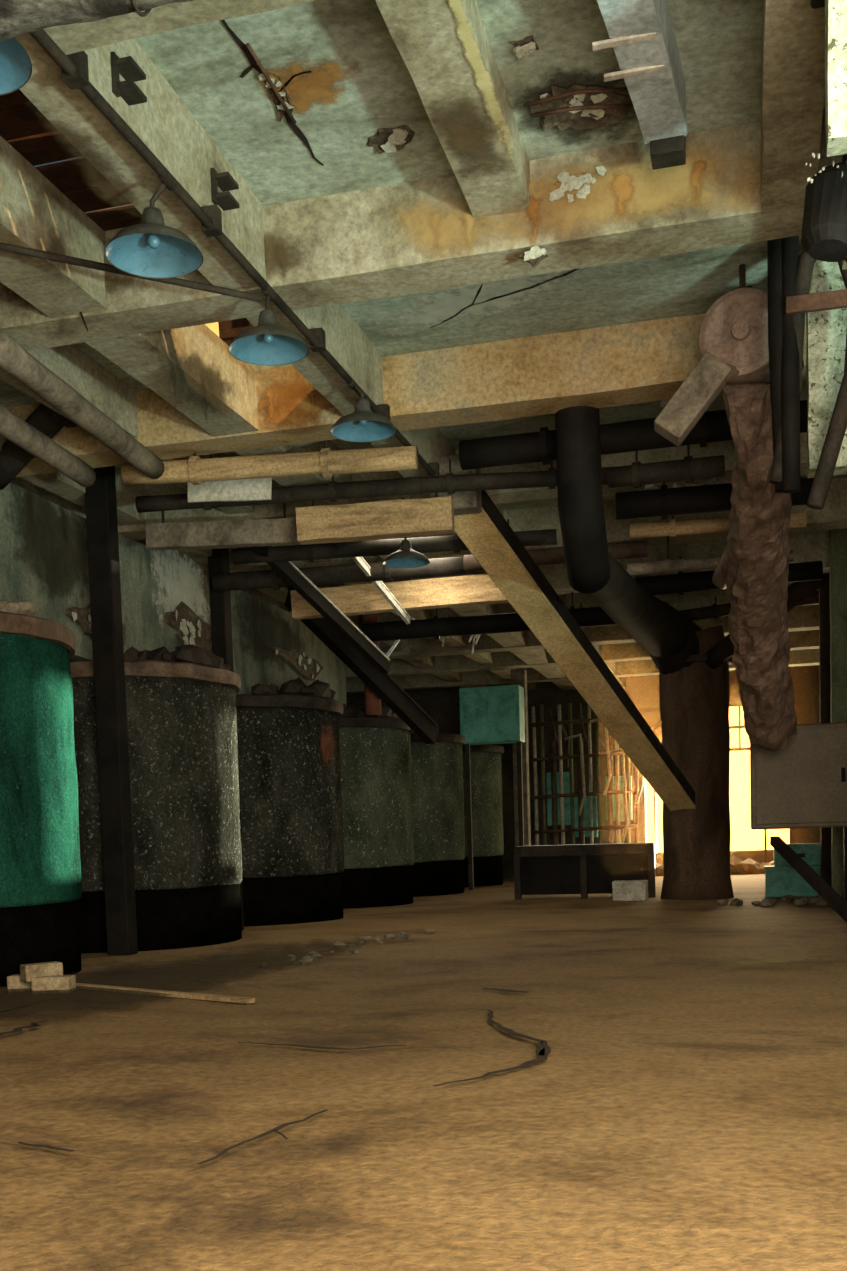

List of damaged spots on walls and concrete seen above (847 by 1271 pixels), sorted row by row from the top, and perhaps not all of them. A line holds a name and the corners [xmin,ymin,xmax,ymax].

corrosion [262,61,350,114]
leakage [449,0,637,154]
peeling [549,166,607,202]
crack [433,1009,551,1086]